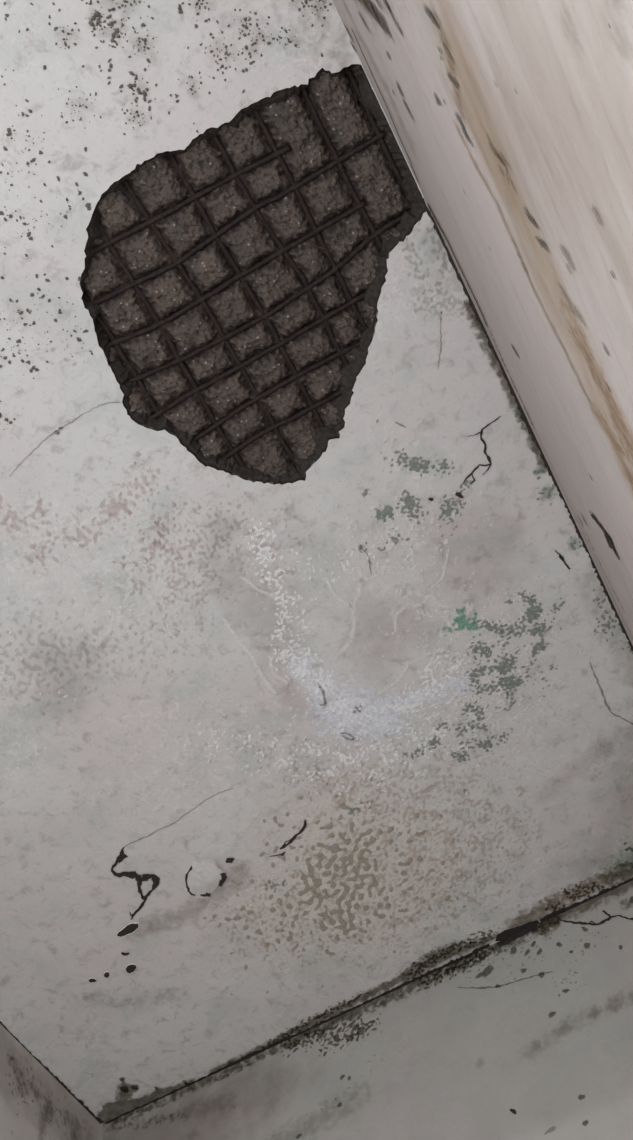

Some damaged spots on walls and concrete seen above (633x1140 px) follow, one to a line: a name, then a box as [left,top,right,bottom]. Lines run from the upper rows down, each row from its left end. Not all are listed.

spalling [80,64,426,485]
leakage [524,208,549,253]
mould [466,302,542,465]
crack [423,198,633,651]
leakage [185,472,591,811]
crack [111,847,160,919]
crack [269,820,307,857]
mould [208,884,605,1082]
mould [98,1078,194,1123]